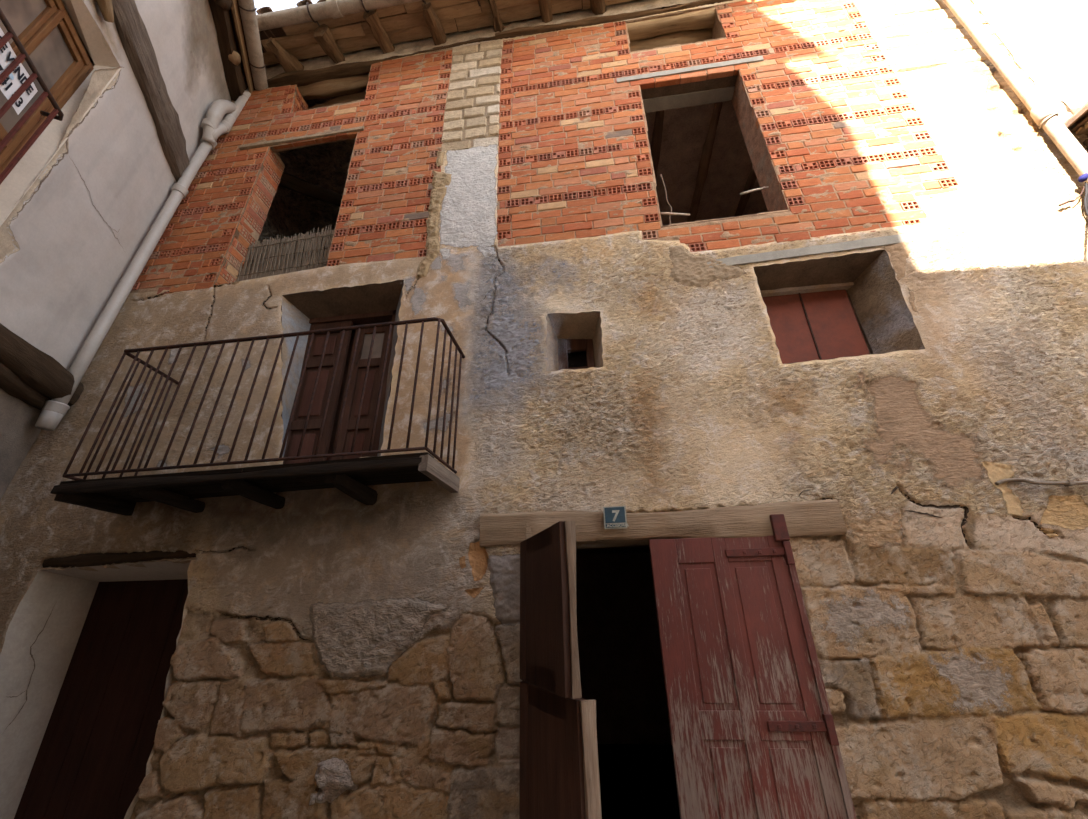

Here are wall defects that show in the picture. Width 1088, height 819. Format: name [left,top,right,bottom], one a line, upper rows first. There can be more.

crack [483,256,508,363]
crack [891,486,971,549]
flaking render [1038,495,1088,538]
flaking render [459,541,489,598]
crack [3,605,55,733]